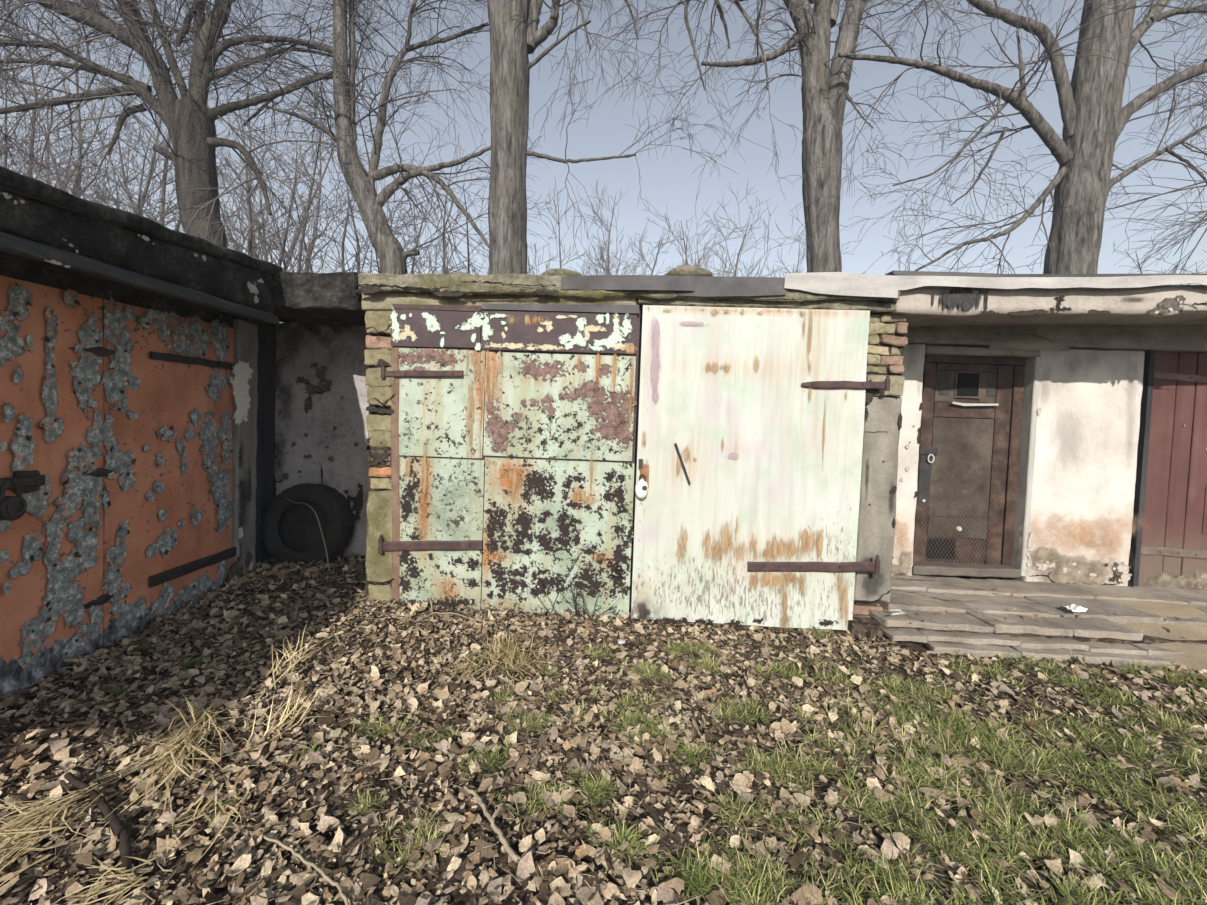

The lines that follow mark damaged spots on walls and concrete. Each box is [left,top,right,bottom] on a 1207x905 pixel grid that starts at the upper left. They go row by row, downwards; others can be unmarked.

spalling [981,295,1072,316]
spalling [1147,295,1207,316]
corrosion [451,347,502,444]
peeling [375,307,637,454]
corrosion [596,343,635,420]
peeling [651,321,659,403]
peeling [0,282,254,675]
peeling [385,465,634,609]
corrosion [678,528,688,562]
corrosion [704,521,831,628]
corrosion [839,573,849,624]
damp [1030,520,1128,586]